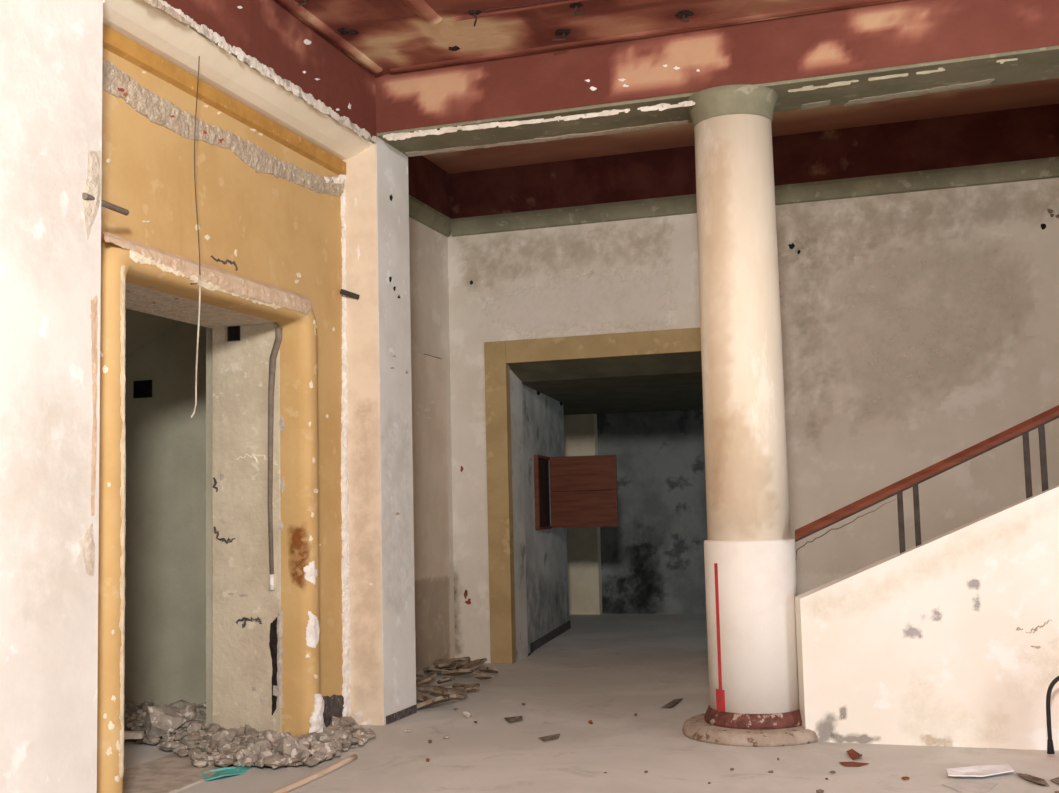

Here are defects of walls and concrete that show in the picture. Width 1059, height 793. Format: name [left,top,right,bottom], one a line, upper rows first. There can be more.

corrosion [290,528,308,586]